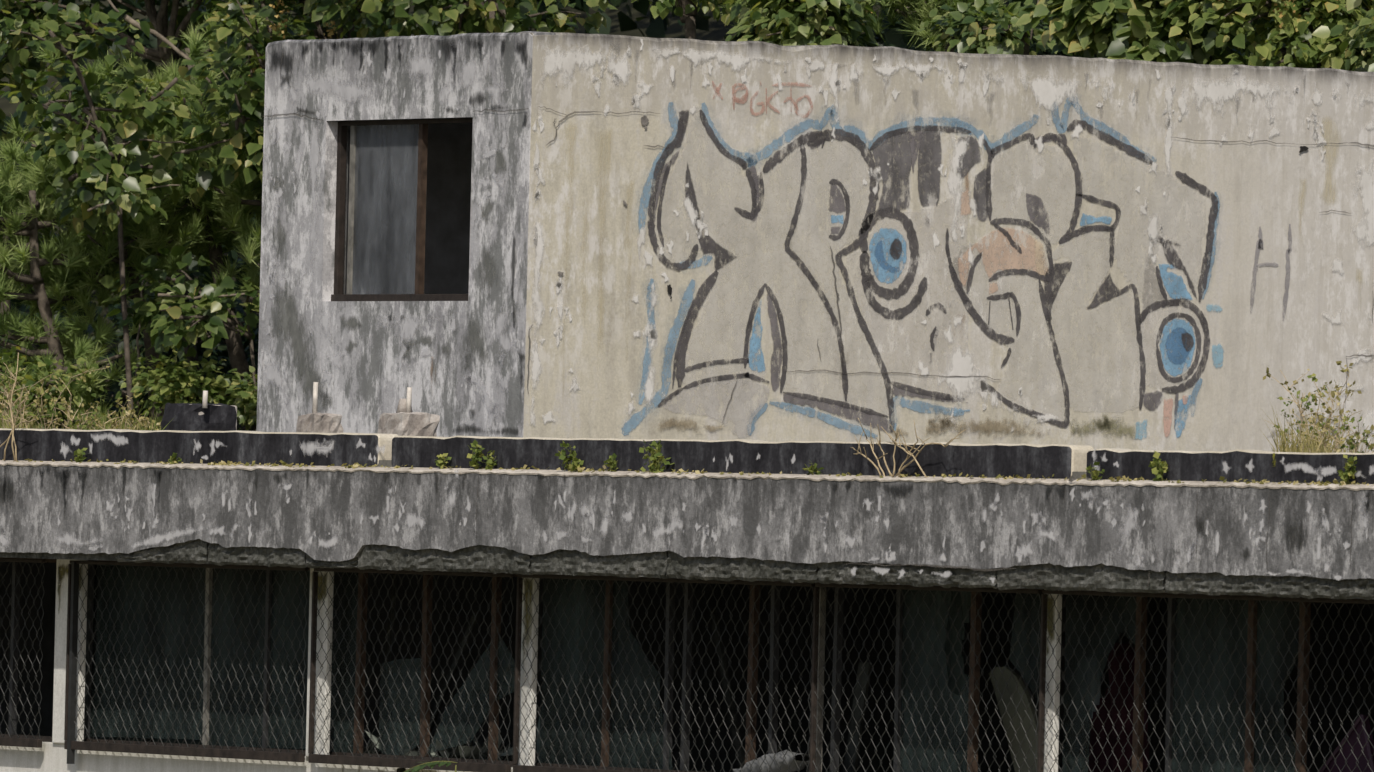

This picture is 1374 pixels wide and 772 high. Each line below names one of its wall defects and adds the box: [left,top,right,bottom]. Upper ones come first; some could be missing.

damp [272,39,402,84]
damp [437,37,483,80]
damp [501,40,527,64]
peeling [543,39,786,129]
peeling [1020,77,1077,153]
damp [479,238,515,325]
damp [275,293,331,410]
damp [453,409,518,433]
peeling [60,434,128,458]
peeling [193,440,222,460]
peeling [290,440,334,455]
spalling [57,449,1374,600]